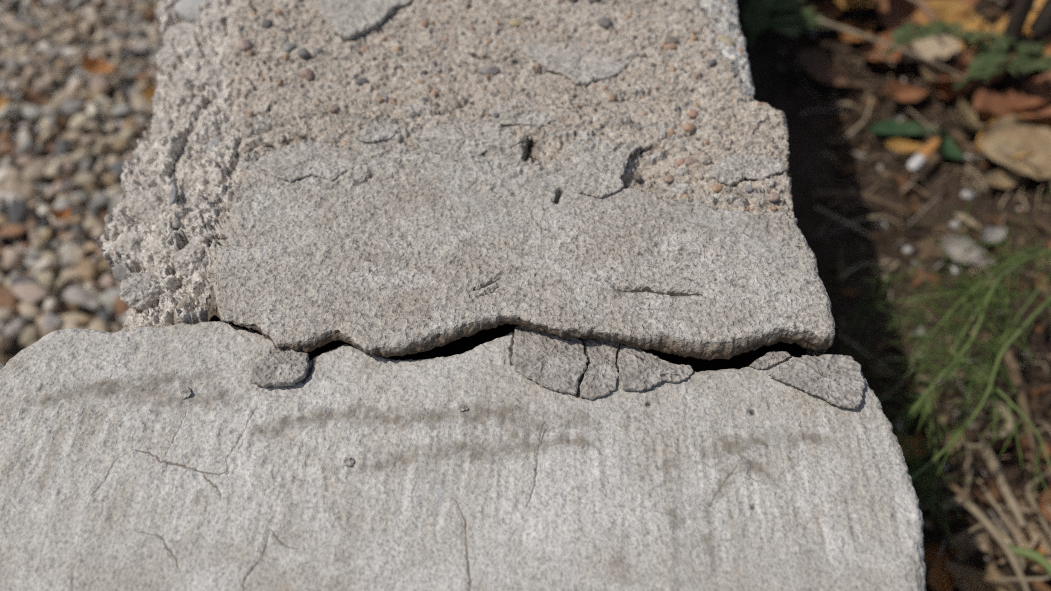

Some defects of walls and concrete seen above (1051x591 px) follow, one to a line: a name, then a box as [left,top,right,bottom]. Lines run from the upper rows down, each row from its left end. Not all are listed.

spalling [217,0,793,212]
crack [223,322,260,333]
spalling [250,345,309,388]
crack [302,323,517,383]
crack [575,338,589,398]
crack [616,328,840,382]
crack [452,496,471,590]